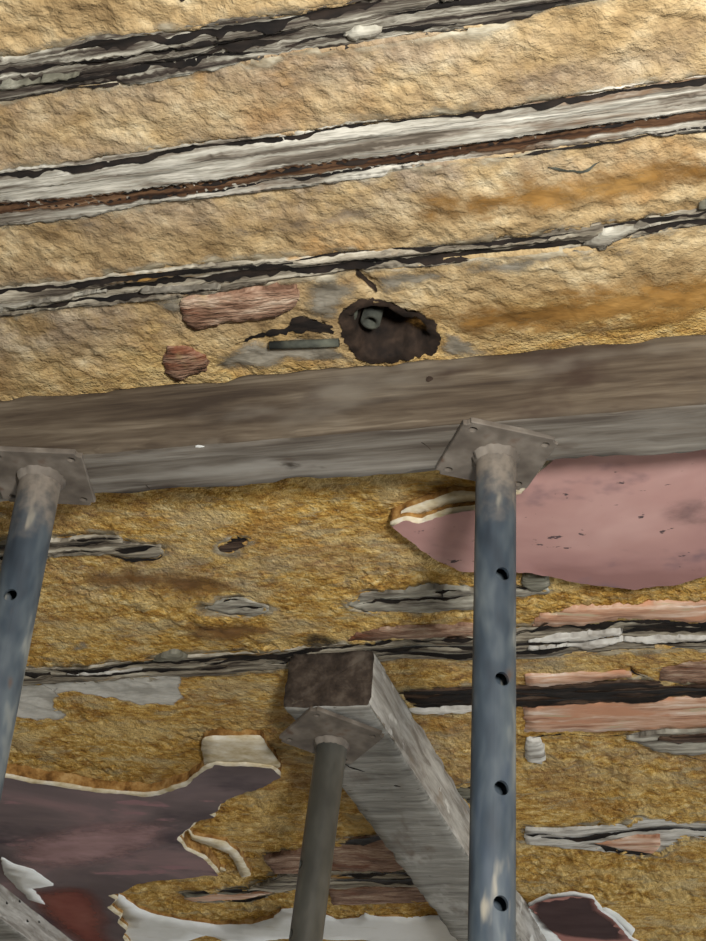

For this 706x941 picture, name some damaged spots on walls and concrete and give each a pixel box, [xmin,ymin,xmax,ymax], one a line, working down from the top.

peeling [343,25,382,42]
peeling [0,72,80,90]
peeling [582,220,661,251]
peeling [0,289,108,312]
peeling [390,485,475,572]
peeling [516,449,706,591]
flaking render [527,600,706,651]
peeling [66,649,188,676]
flaking render [523,660,706,764]
peeling [0,728,293,941]
flaking render [323,912,457,941]
peeling [528,888,643,941]